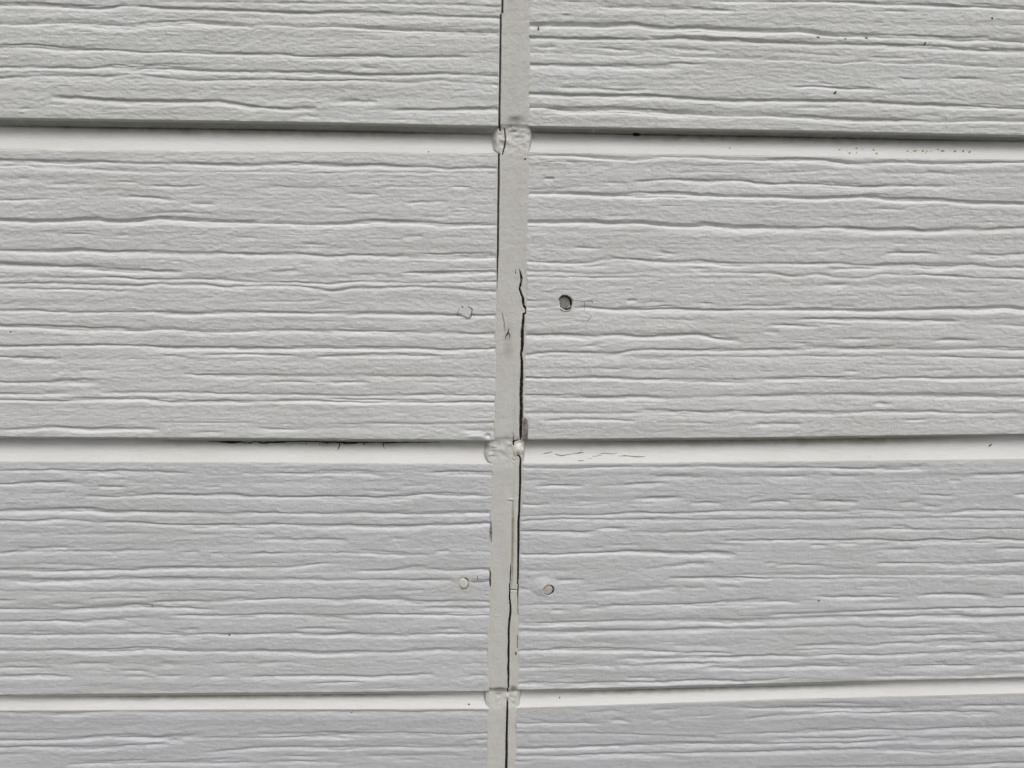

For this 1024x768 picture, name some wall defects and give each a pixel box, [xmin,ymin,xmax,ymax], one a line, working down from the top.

crack [208,441,437,450]
crack [471,0,645,768]